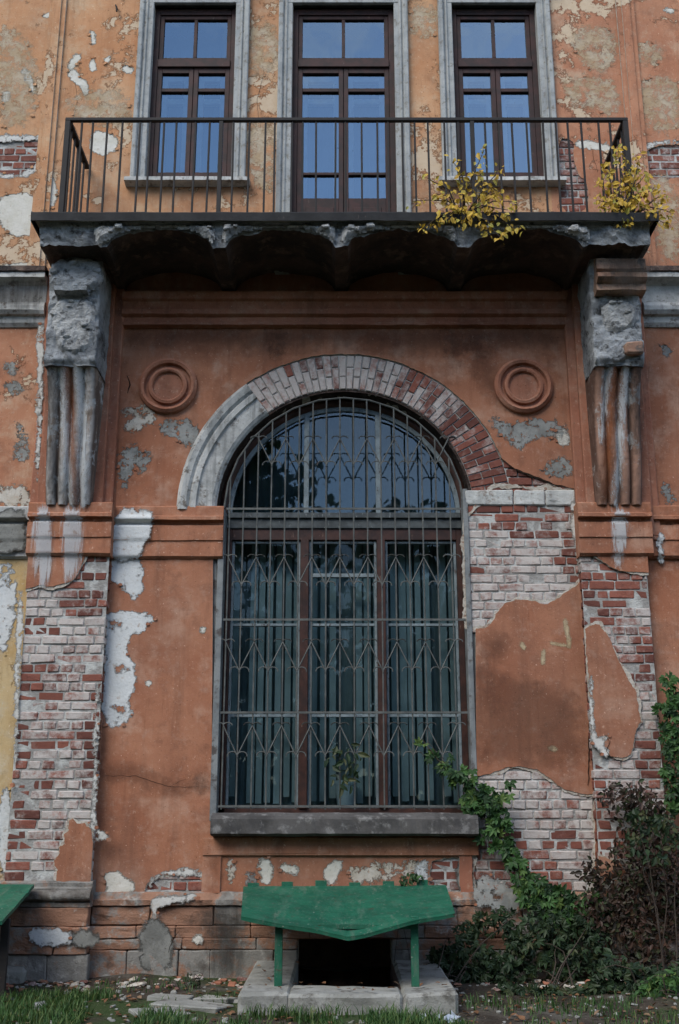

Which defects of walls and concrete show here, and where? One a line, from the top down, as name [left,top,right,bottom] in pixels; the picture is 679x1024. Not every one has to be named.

peeling [0,24,38,179]
peeling [564,24,621,117]
flaking render [558,139,610,212]
peeling [638,41,679,260]
peeling [116,404,200,489]
flaking render [247,355,669,917]
flaking render [0,507,202,919]
peeling [225,855,300,886]
peeling [28,925,73,948]